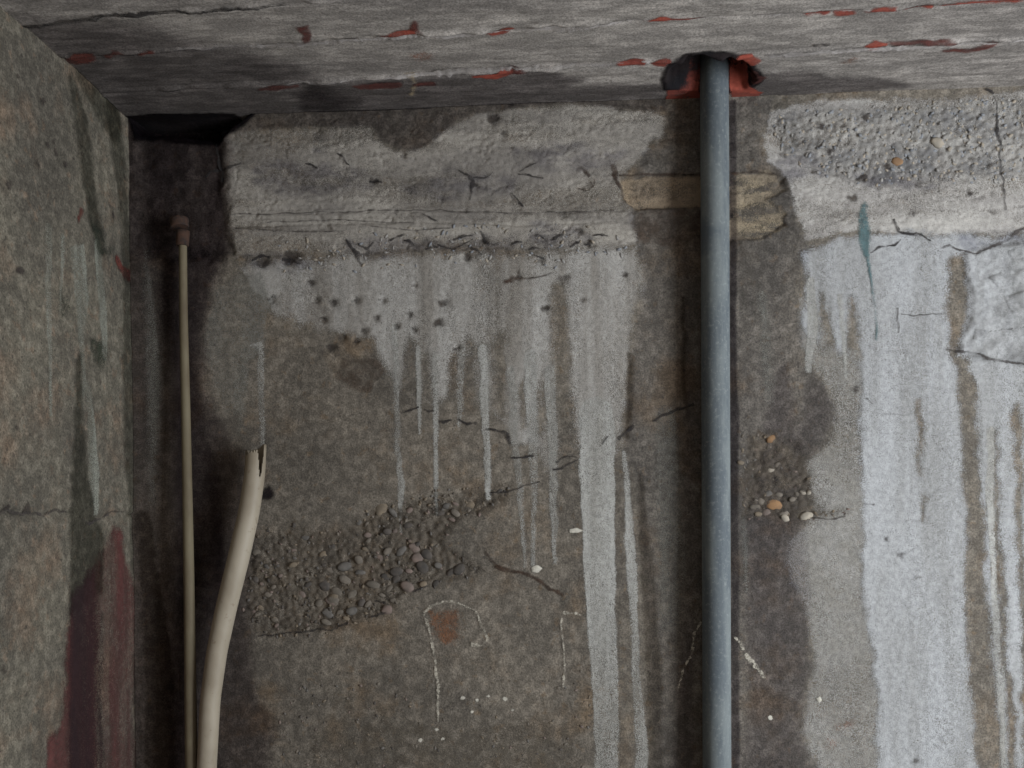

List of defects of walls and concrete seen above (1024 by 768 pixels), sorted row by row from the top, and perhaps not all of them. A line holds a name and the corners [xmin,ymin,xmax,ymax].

crack [25,5,283,29]
crack [459,163,543,207]
crack [874,89,1024,256]
crack [252,254,299,264]
crack [346,216,608,264]
leakage [203,239,650,768]
leakage [781,202,1024,768]